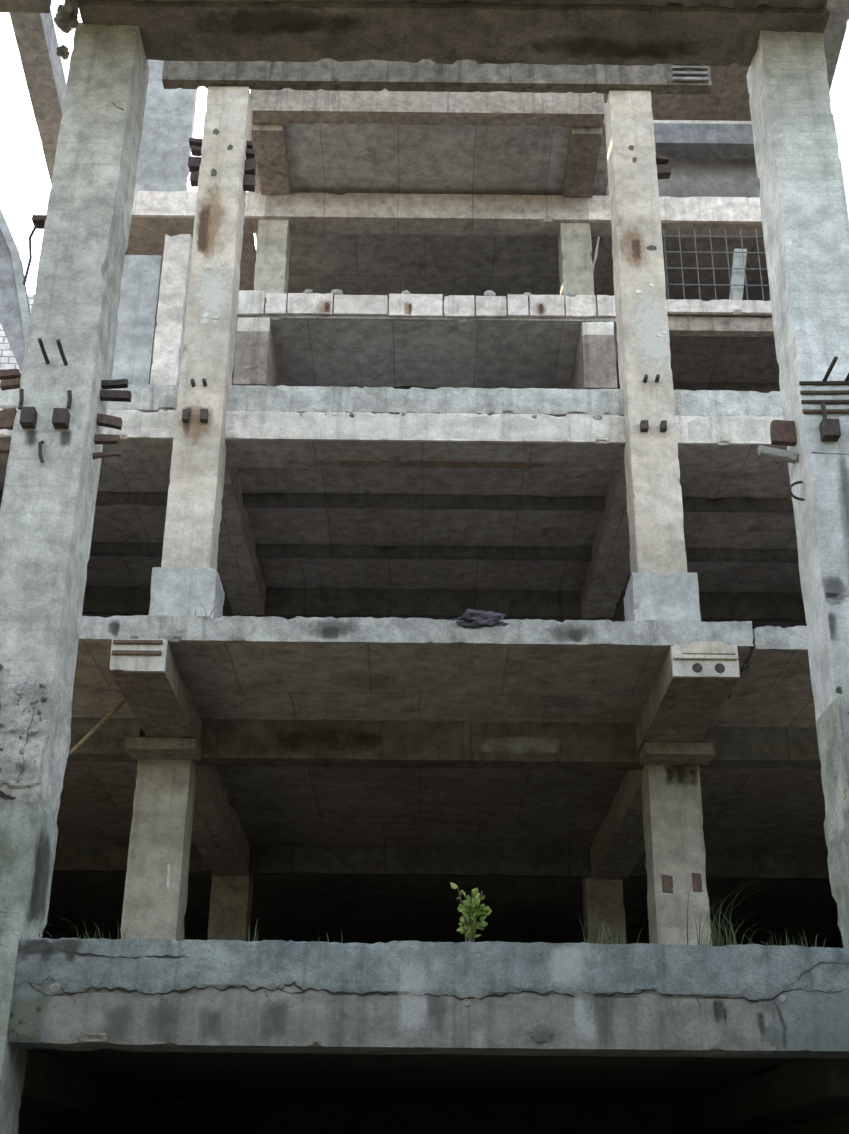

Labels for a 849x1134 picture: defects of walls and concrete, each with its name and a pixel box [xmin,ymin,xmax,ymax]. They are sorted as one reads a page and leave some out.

corrosion [197,205,221,251]
corrosion [627,233,640,264]
spalling [0,664,56,789]
crack [14,950,849,1049]